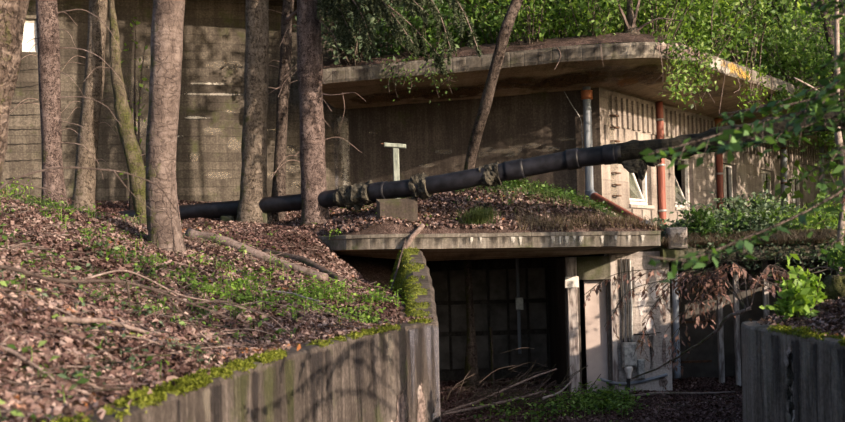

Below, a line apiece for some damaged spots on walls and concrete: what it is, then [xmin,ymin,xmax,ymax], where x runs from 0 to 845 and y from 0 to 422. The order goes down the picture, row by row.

spalling [391,382,436,422]